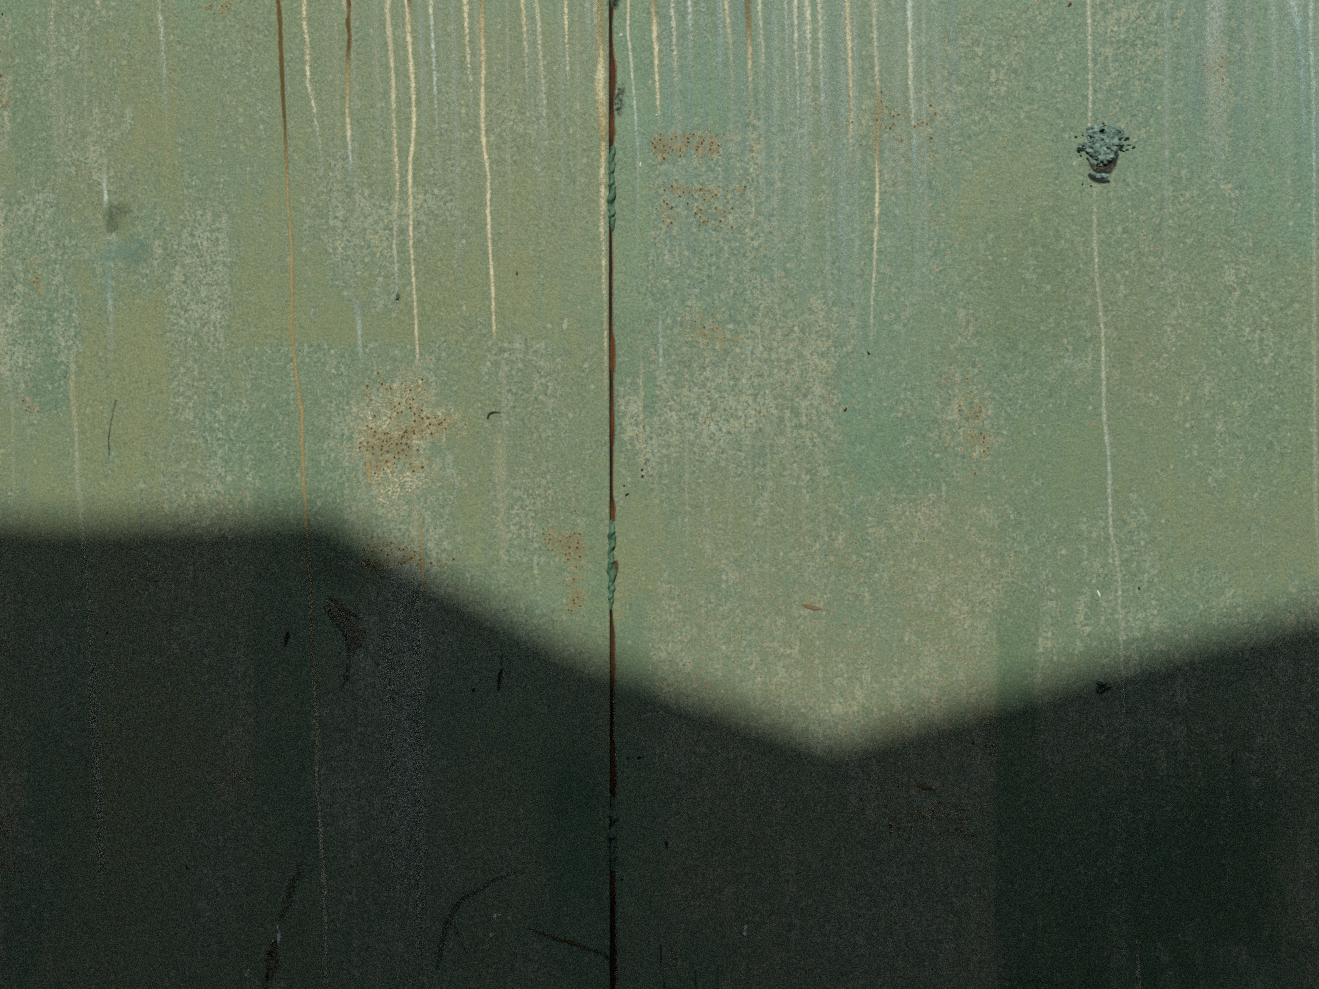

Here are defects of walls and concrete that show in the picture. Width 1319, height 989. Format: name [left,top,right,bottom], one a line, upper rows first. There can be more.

water stain [342,0,352,172]
water stain [350,0,458,514]
water stain [452,0,496,338]
rust [609,6,617,146]
water stain [651,0,881,329]
water stain [906,0,936,178]
water stain [1271,0,1316,330]
rust [354,372,466,491]
water stain [1093,188,1124,682]